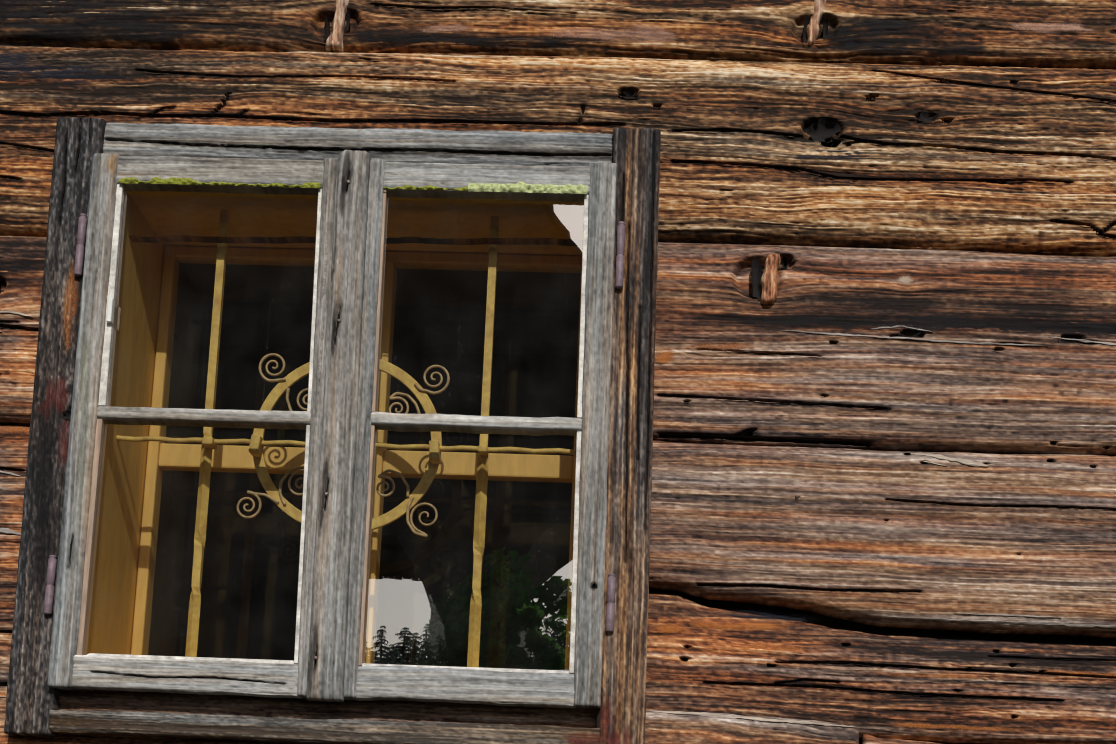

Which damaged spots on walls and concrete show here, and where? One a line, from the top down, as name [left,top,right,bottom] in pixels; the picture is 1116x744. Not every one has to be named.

crack [7,73,588,224]
crack [1056,222,1116,239]